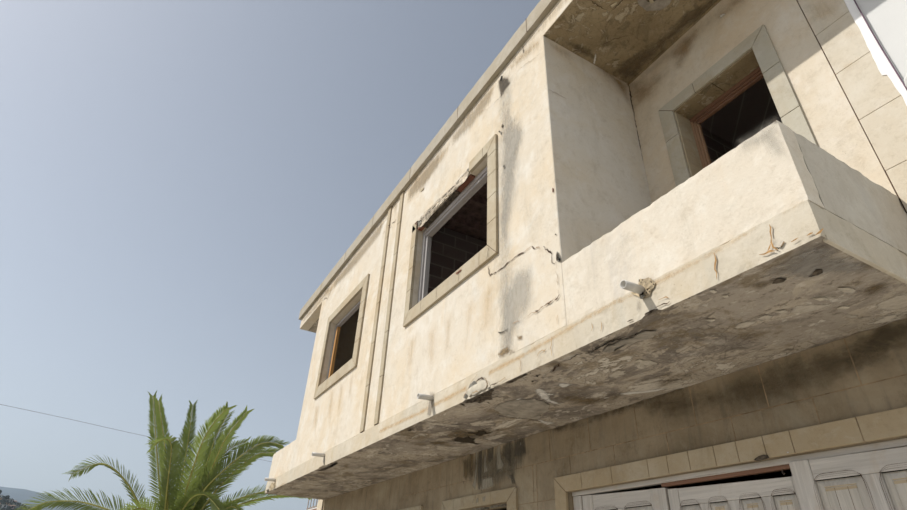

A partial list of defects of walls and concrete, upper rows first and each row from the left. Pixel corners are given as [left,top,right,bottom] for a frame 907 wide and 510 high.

leakage [504,121,520,222]
leakage [498,275,526,356]
crack [487,246,559,333]
flaking render [631,277,670,317]
peeling [734,287,907,329]
spalling [460,374,528,406]
leakage [432,430,526,500]